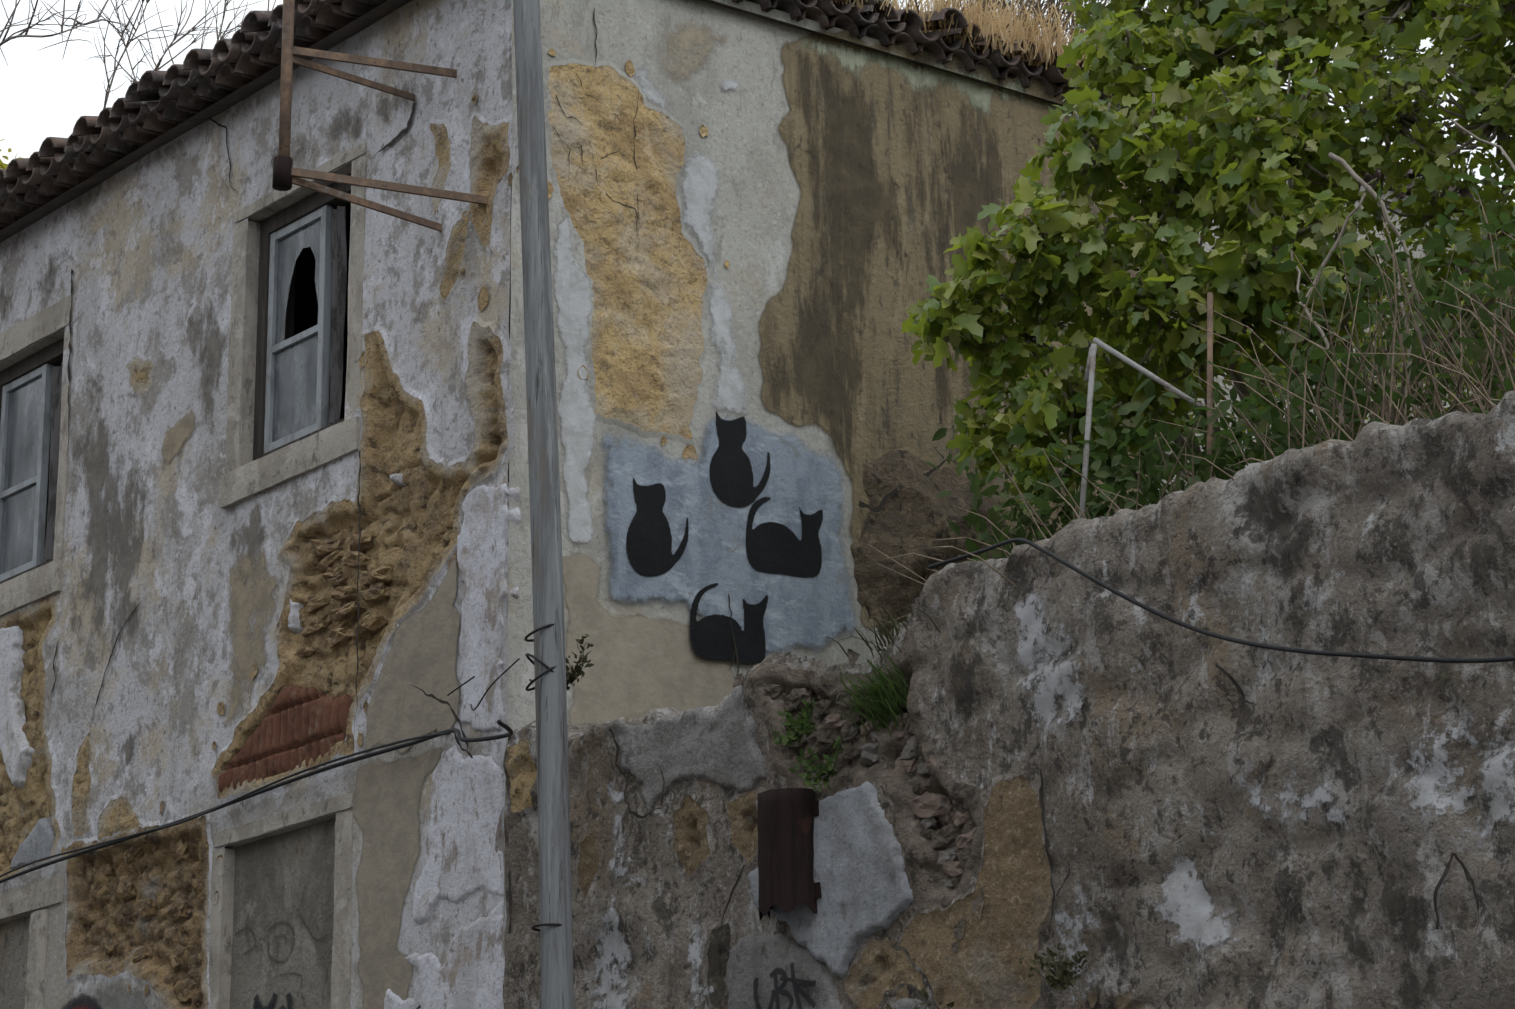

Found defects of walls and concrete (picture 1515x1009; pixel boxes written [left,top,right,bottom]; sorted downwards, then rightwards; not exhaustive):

spalling [0,286,538,1009]
spalling [428,95,519,305]
spalling [542,48,749,544]
spalling [669,597,1061,1009]
leakage [759,30,1119,563]
leakage [1082,168,1141,249]
leakage [1092,451,1148,516]